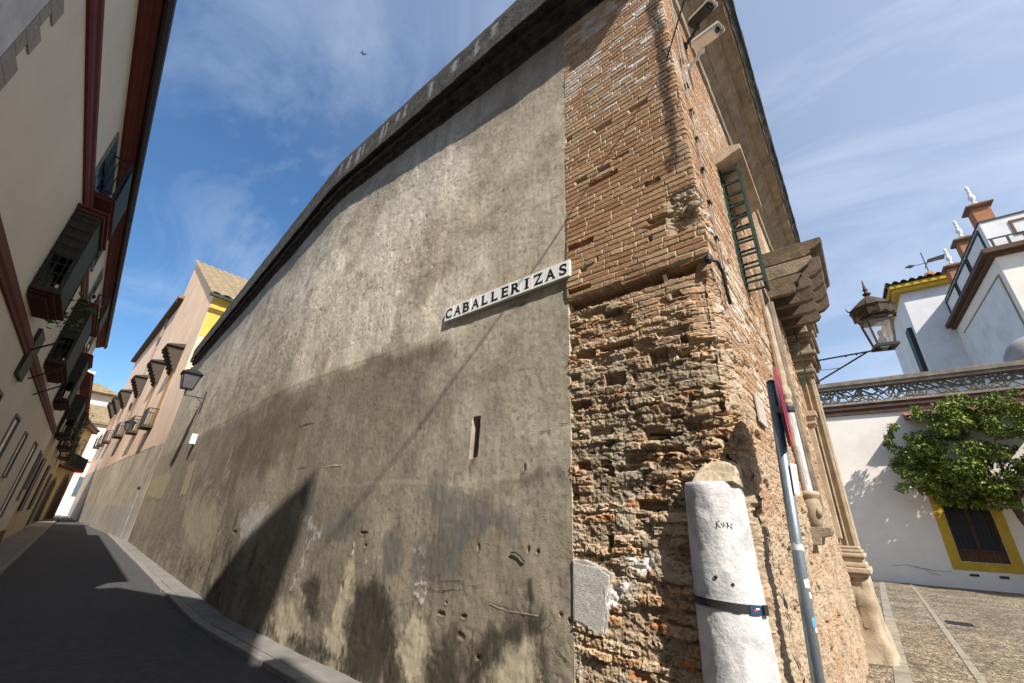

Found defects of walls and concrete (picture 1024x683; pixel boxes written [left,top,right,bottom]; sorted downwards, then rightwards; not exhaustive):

spalling [666,188,700,232]
water stain [261,533,401,683]
water stain [426,611,549,683]
spalling [629,670,652,682]